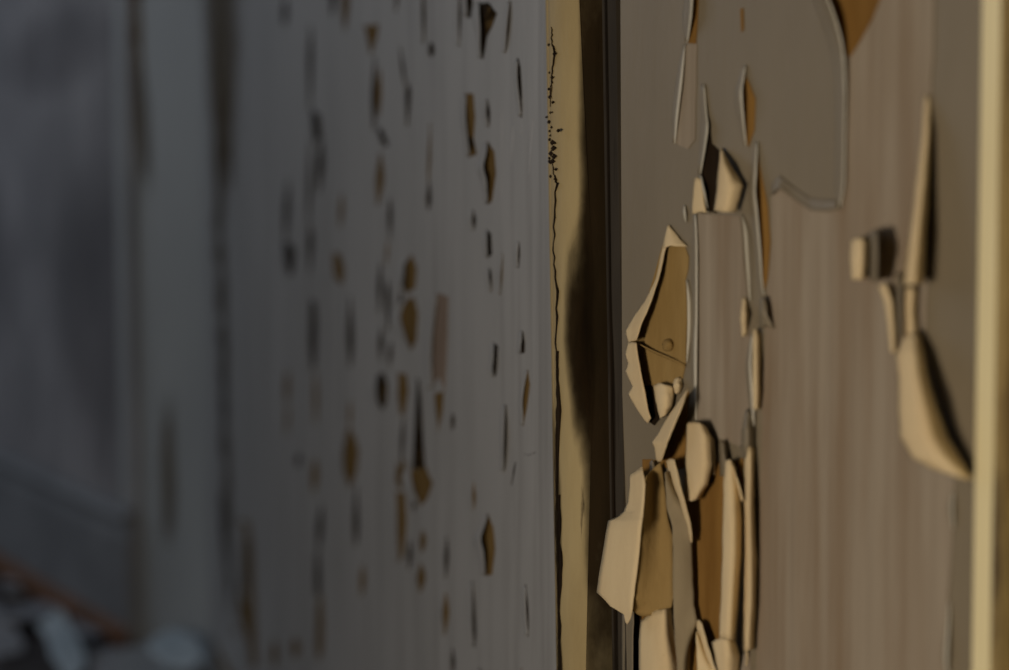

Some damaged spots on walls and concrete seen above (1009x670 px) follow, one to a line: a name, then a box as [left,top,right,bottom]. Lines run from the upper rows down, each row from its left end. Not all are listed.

peeling [279,25,324,276]
peeling [460,93,496,204]
peeling [455,0,510,59]
peeling [514,58,522,118]
crack [548,27,556,107]
peeling [327,0,455,596]
peeling [468,210,520,294]
peeling [519,369,530,425]
crack [511,159,563,657]
peeling [596,0,972,670]
peeling [230,520,258,668]
peeling [468,513,495,647]